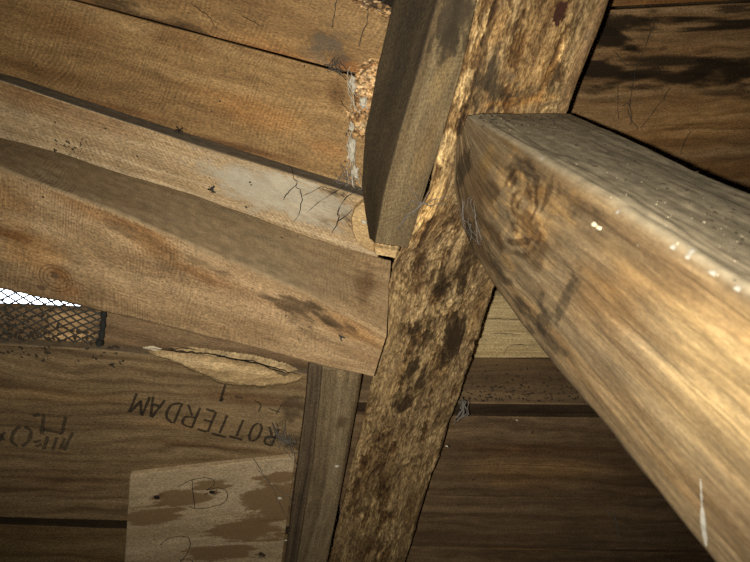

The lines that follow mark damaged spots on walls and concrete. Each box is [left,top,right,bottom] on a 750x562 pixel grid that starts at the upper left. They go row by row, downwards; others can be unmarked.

water stain [581,5,750,97]
crack [283,170,355,233]
water stain [433,246,477,300]
water stain [408,320,432,341]
water stain [441,311,466,365]
water stain [392,350,426,413]